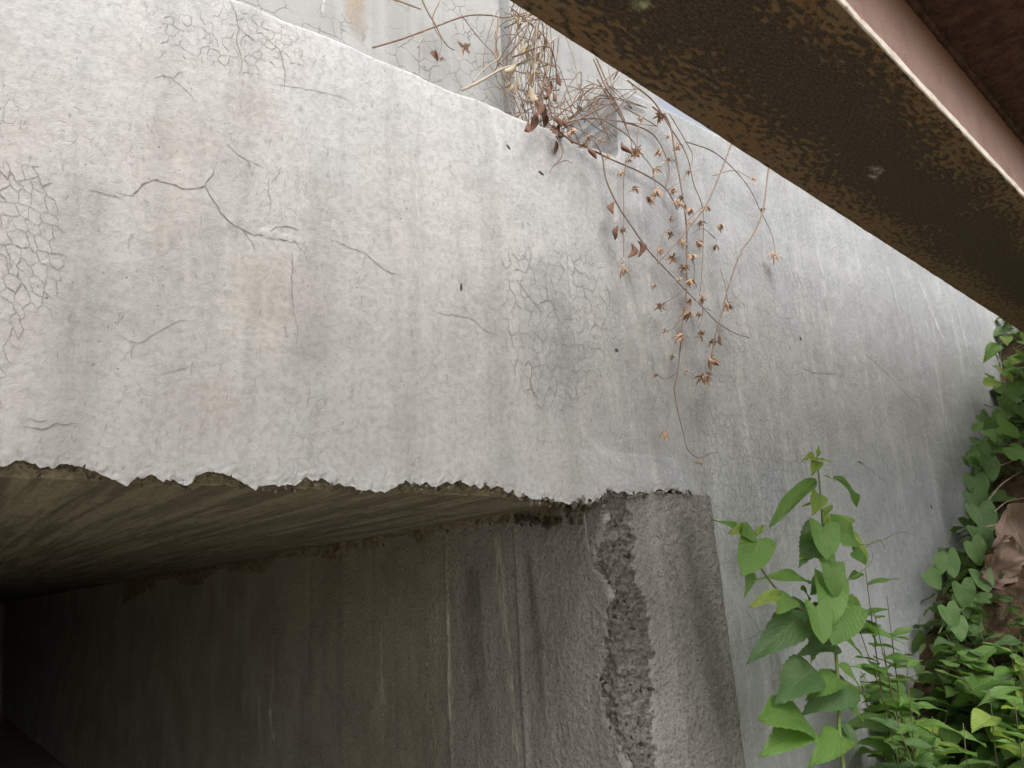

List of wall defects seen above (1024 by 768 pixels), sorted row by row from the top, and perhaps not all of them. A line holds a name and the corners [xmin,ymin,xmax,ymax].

crack [154,1,353,104]
crack [0,161,67,379]
crack [88,142,309,351]
crack [433,238,612,413]
spalling [0,460,368,496]
spalling [387,480,692,768]